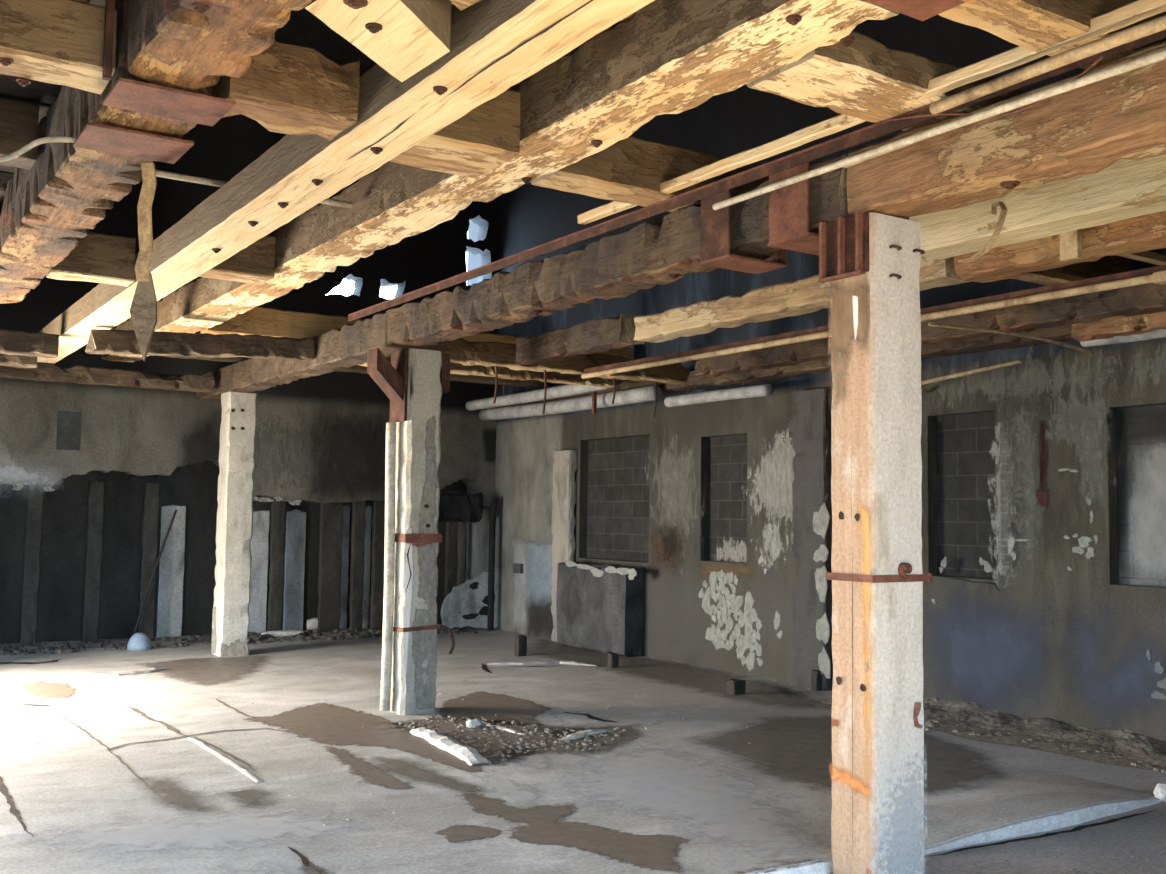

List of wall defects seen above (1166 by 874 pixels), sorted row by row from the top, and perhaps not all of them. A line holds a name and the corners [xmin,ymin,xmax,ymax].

water stain [0,464,54,486]
spalling [462,582,495,619]
peeling [699,570,783,671]
peeling [813,502,830,678]
peeling [979,557,993,573]
peeling [1008,536,1029,561]
peeling [1064,497,1098,560]
water stain [528,641,832,787]
crack [0,777,34,837]
water stain [245,703,690,873]
water stain [924,735,999,793]
crack [287,846,309,867]